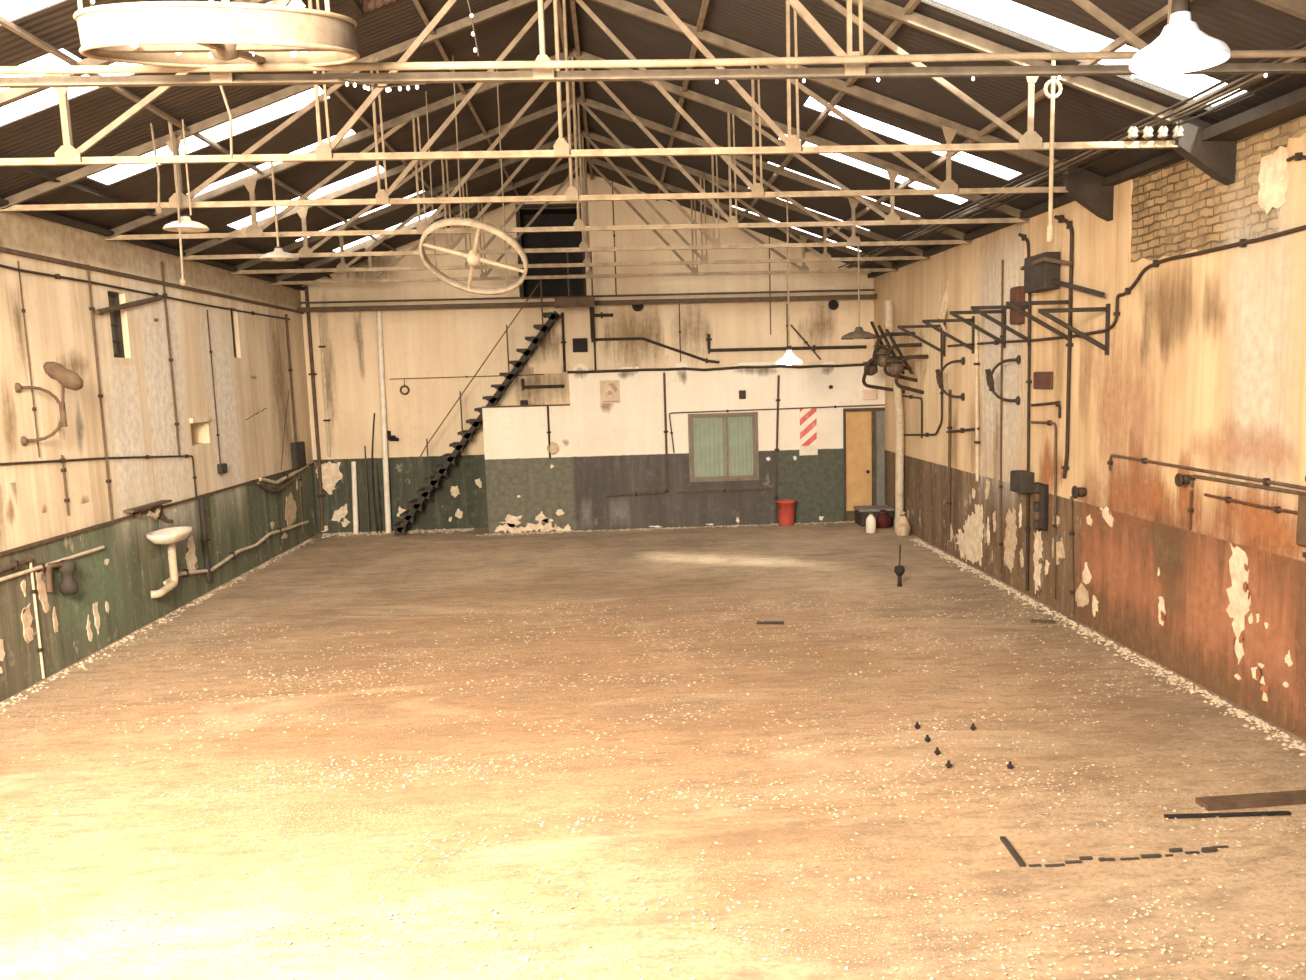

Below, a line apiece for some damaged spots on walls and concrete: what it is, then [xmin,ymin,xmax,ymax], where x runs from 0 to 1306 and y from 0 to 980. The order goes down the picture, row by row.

spalling [1258,146,1290,214]
water stain [0,224,36,589]
water stain [72,389,89,466]
water stain [250,279,299,517]
peeling [270,478,302,539]
peeling [314,459,350,532]
peeling [494,509,573,533]
spalling [949,479,1065,594]
peeling [1075,562,1099,617]
rust [1078,437,1306,739]
peeling [1226,543,1293,702]